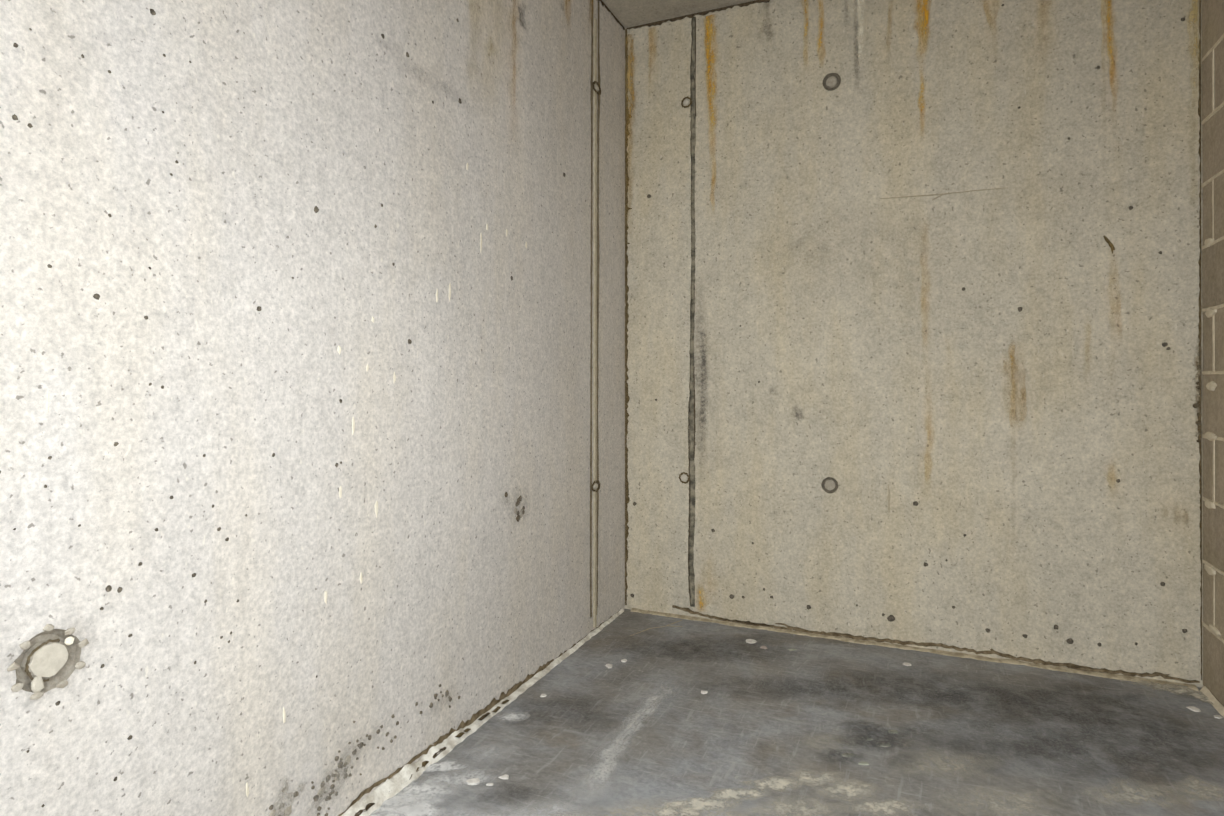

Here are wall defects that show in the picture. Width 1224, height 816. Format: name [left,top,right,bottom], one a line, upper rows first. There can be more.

corrosion [706,15,715,124]
damp [497,713,525,721]
damp [369,761,488,816]
damp [616,772,913,816]